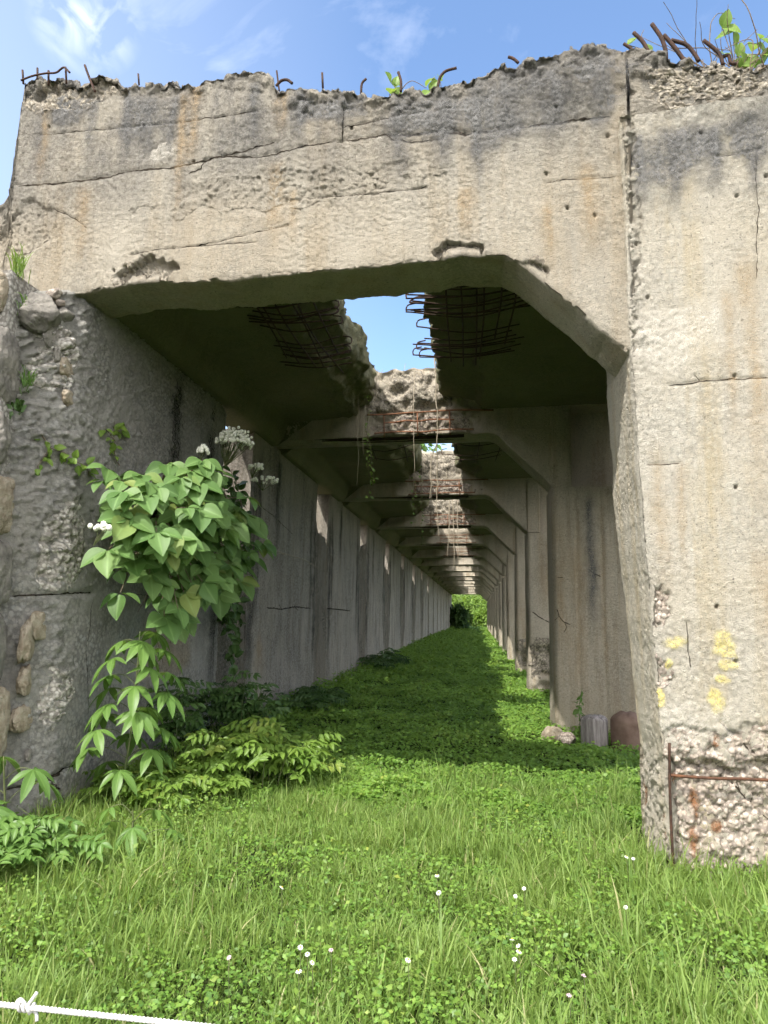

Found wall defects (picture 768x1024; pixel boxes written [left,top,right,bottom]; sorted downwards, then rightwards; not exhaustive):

spalling [23,75,129,114]
spalling [634,58,768,110]
crack [17,108,609,227]
leakage [632,111,768,190]
crack [129,186,426,255]
spalling [435,244,484,261]
crack [720,150,760,278]
spalling [649,588,670,627]
corrosion [689,790,699,851]
spalling [660,723,768,879]